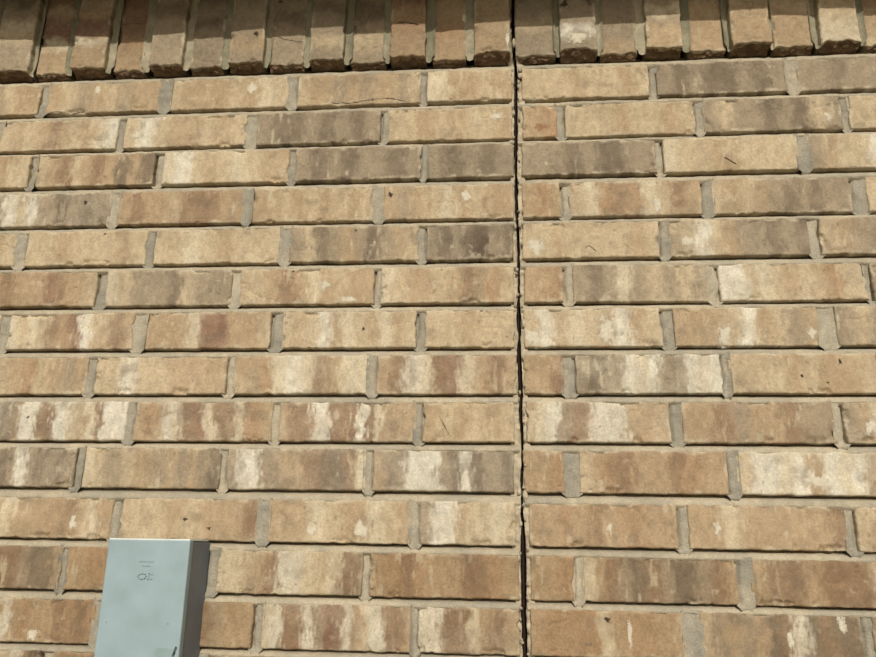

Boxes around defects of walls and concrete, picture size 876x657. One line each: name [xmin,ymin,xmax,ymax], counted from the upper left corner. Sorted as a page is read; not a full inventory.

crack [511,0,530,657]